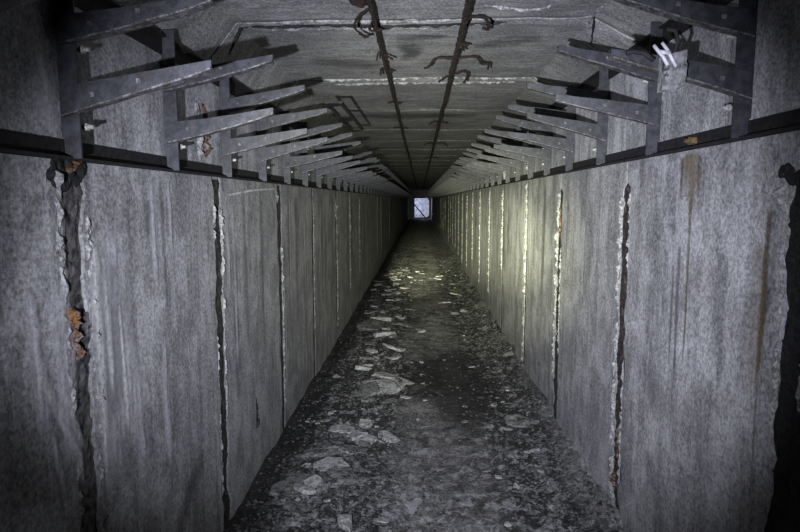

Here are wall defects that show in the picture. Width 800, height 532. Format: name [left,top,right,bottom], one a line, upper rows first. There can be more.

spalling [772,162,800,216]
spalling [46,149,87,421]
peeling [777,241,789,322]
corrosion [64,307,90,364]
peeling [769,334,781,437]